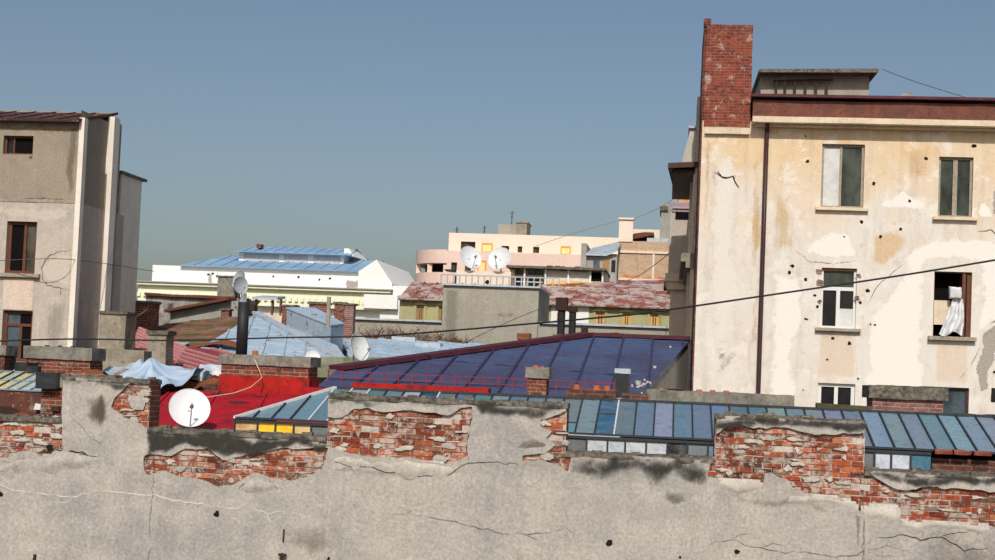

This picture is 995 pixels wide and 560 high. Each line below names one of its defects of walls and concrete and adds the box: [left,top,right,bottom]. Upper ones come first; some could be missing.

peeling [879,191,924,209]
peeling [978,191,995,218]
peeling [807,232,856,260]
peeling [769,273,803,405]
peeling [815,237,995,391]
spalling [0,421,63,460]
spalling [112,383,152,427]
crack [0,420,322,560]
spalling [145,407,473,486]
spalling [708,425,995,527]